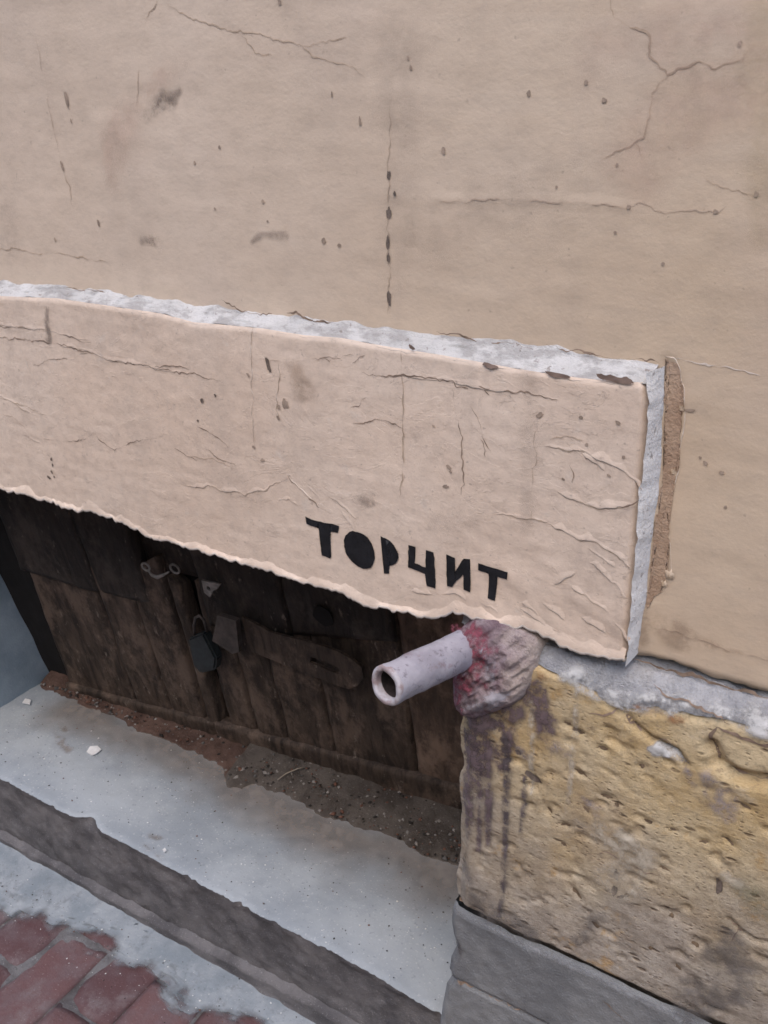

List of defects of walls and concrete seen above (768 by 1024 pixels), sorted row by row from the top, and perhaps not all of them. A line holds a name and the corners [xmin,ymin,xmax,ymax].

crack [136,2,364,103]
crack [603,0,754,173]
crack [385,92,393,315]
crack [0,322,220,381]
crack [177,427,228,465]
crack [288,476,319,508]
crack [271,354,556,497]
peeling [558,478,632,510]
peeling [597,374,634,385]
spalling [646,356,686,608]
peeling [497,512,630,598]
damp [452,622,768,1024]